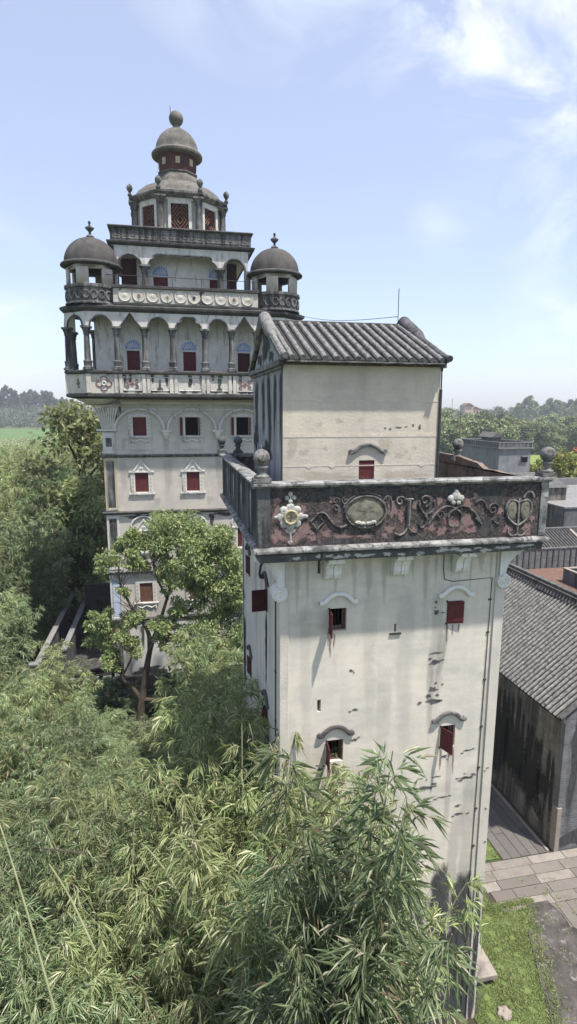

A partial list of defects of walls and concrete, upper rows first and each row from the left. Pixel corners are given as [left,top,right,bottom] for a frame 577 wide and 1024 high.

leakage [272,490,291,500]
leakage [308,488,344,501]
leakage [371,486,453,496]
leakage [316,520,533,559]
flaking render [417,682,444,705]
leakage [492,688,555,819]